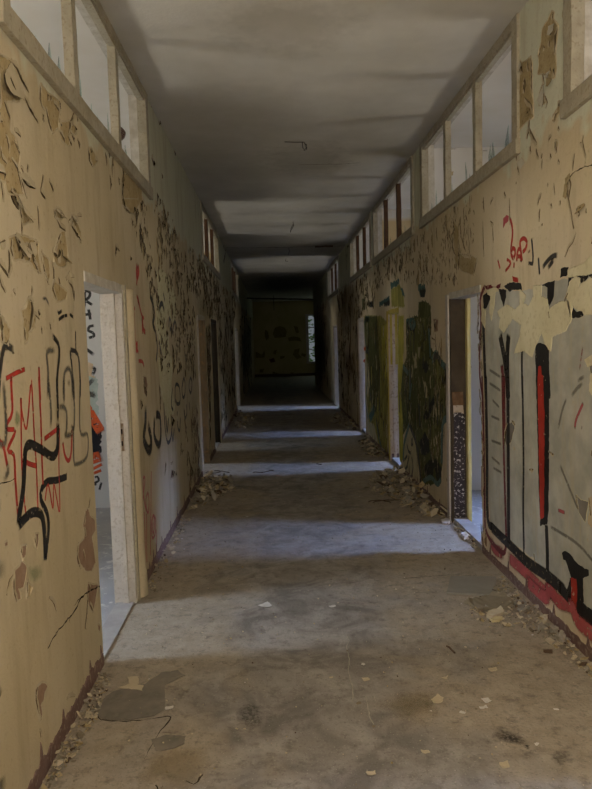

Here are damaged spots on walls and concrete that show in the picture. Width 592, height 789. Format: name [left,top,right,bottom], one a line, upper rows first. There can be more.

peeling [515,10,563,184]
peeling [0,53,252,496]
peeling [314,195,494,442]
peeling [477,256,592,372]
peeling [537,135,587,257]
crack [48,586,100,648]